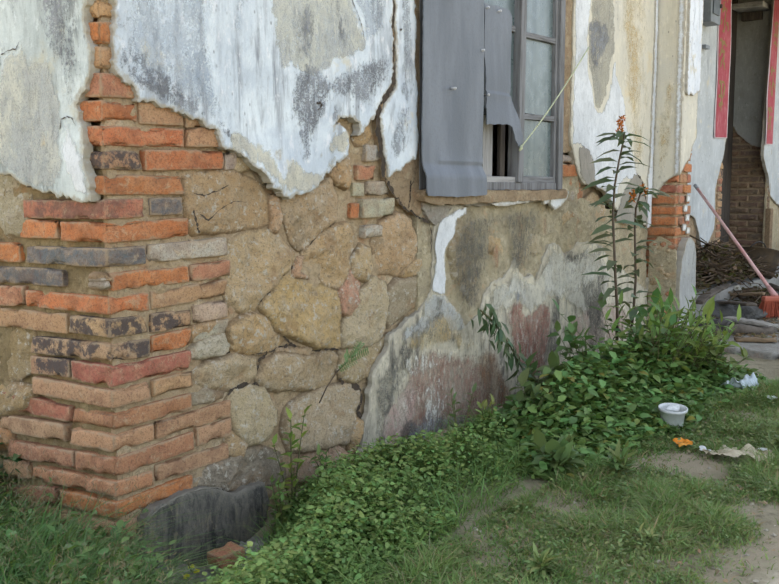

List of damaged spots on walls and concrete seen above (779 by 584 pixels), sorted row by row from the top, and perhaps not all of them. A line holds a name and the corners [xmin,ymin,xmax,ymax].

water stain [293,60,386,156]
crack [375,0,432,253]
spalling [378,0,699,339]
spalling [709,132,779,250]
spalling [0,0,432,584]
water stain [377,299,465,444]
peeling [492,249,626,377]
water stain [569,255,605,356]